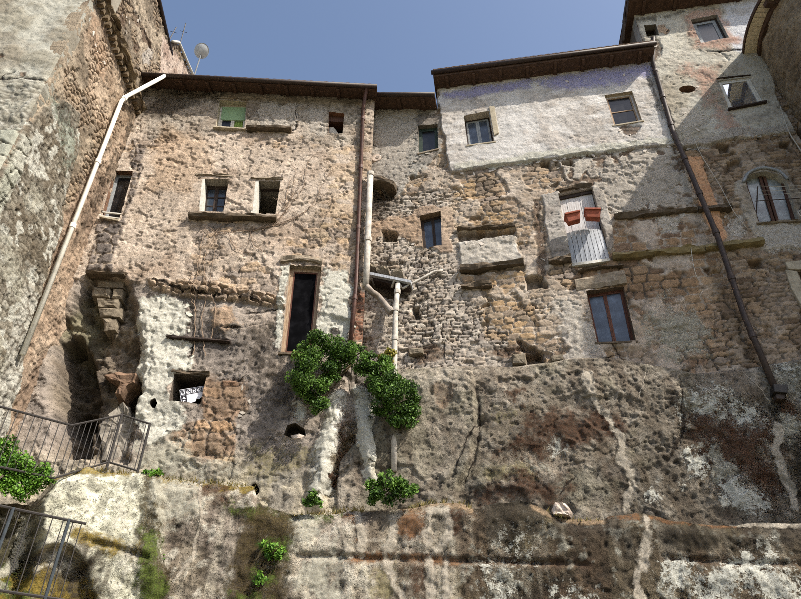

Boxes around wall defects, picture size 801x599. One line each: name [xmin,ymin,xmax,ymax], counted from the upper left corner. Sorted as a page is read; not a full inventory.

peeling [372,109,430,186]
peeling [454,65,795,233]
peeling [374,214,421,246]
peeling [457,235,517,264]
flaking render [532,200,549,279]
peeling [757,224,801,255]
peeling [134,293,194,444]
crack [453,387,481,485]